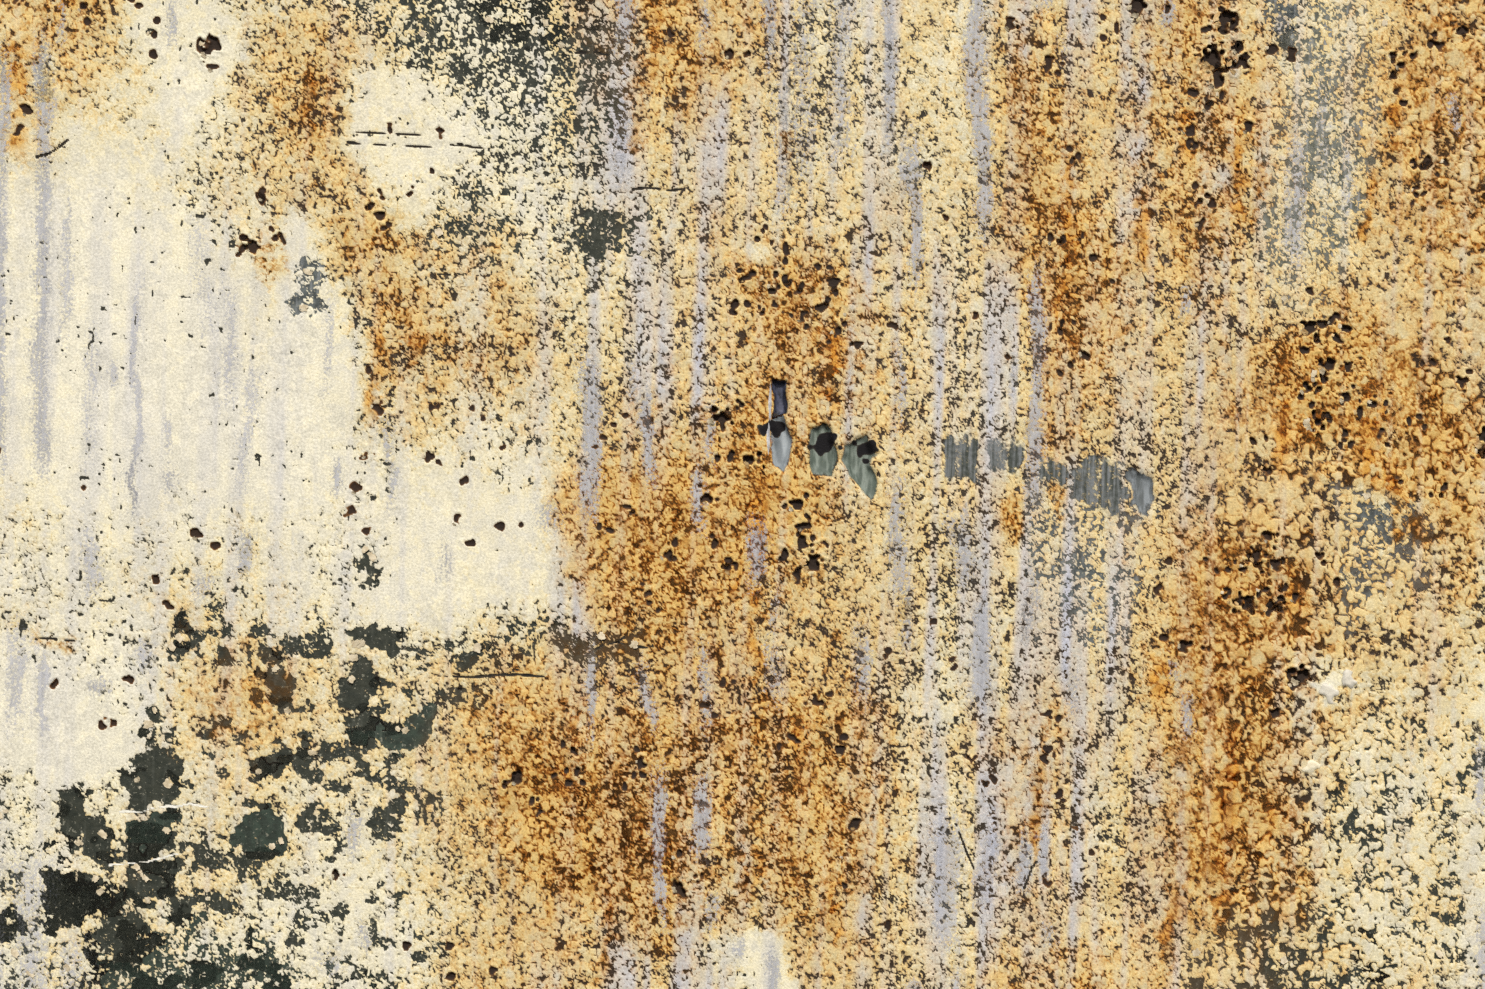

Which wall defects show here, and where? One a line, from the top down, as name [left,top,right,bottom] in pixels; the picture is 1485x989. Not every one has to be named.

spalling [196,33,222,73]
peeling [342,0,645,173]
damp [959,0,995,247]
damp [27,6,75,477]
damp [574,344,604,530]
damp [935,260,1131,526]
spalling [190,528,221,550]
peeling [0,575,648,989]
damp [646,775,671,928]
damp [690,774,712,859]
spalling [695,676,737,719]
spalling [803,691,834,706]